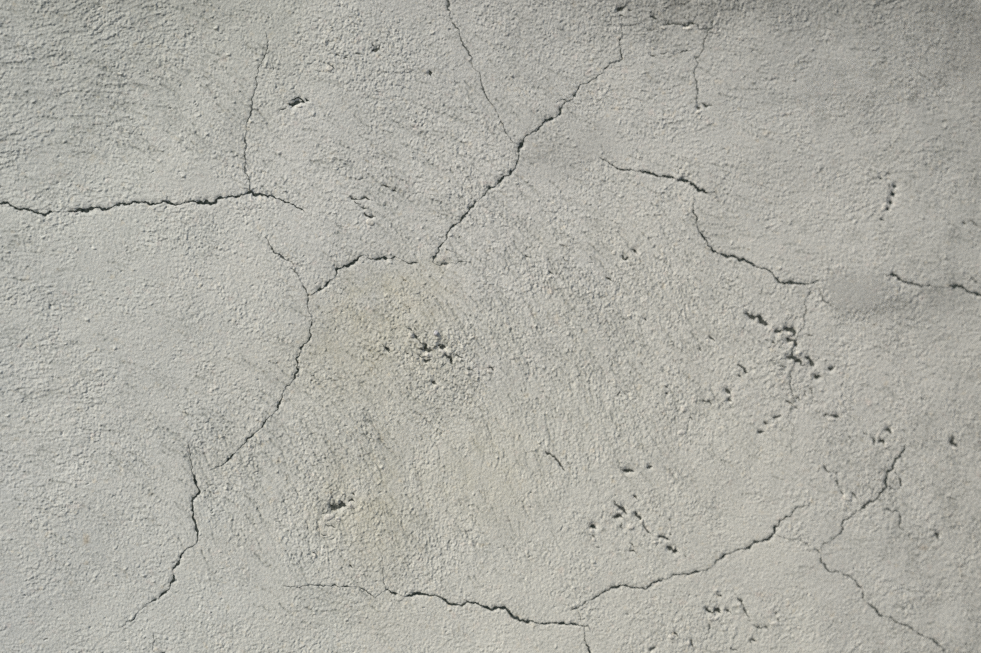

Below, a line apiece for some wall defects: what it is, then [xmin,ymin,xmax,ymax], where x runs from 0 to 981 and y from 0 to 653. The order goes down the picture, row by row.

crack [0,41,304,217]
crack [693,20,714,104]
crack [125,0,623,623]
crack [600,157,841,451]
crack [885,273,981,296]
crack [286,446,945,653]